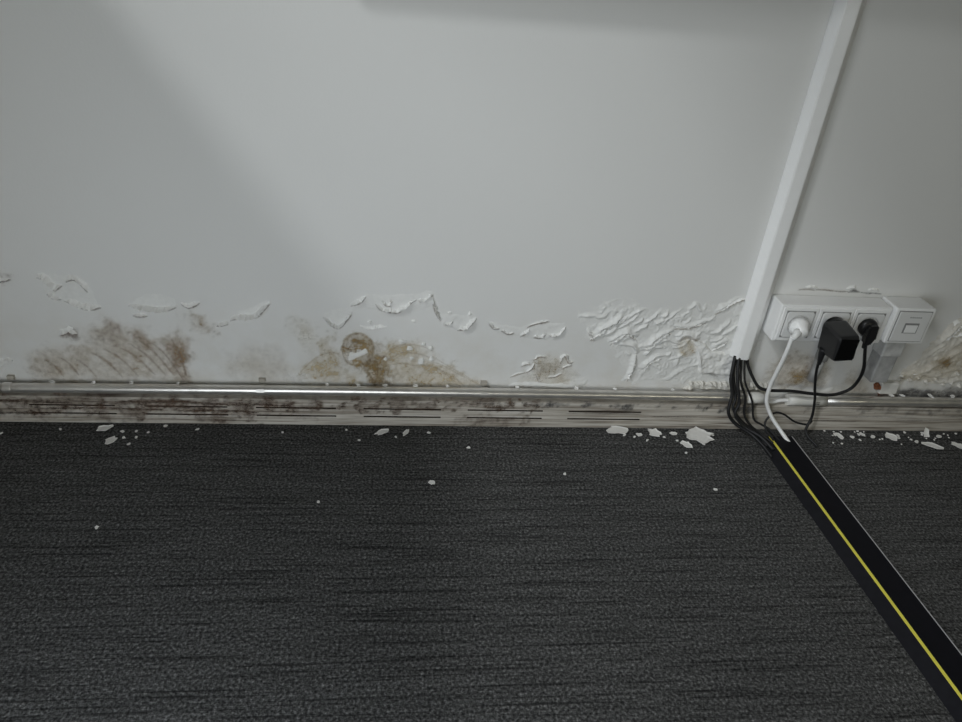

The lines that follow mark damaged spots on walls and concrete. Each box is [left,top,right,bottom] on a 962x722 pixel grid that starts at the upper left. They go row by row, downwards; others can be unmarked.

peeling [323,290,477,331]
peeling [489,320,566,340]
peeling [506,354,588,389]
flaking render [681,380,768,391]
damp [898,388,961,397]
damp [0,393,295,423]
damp [419,398,554,419]